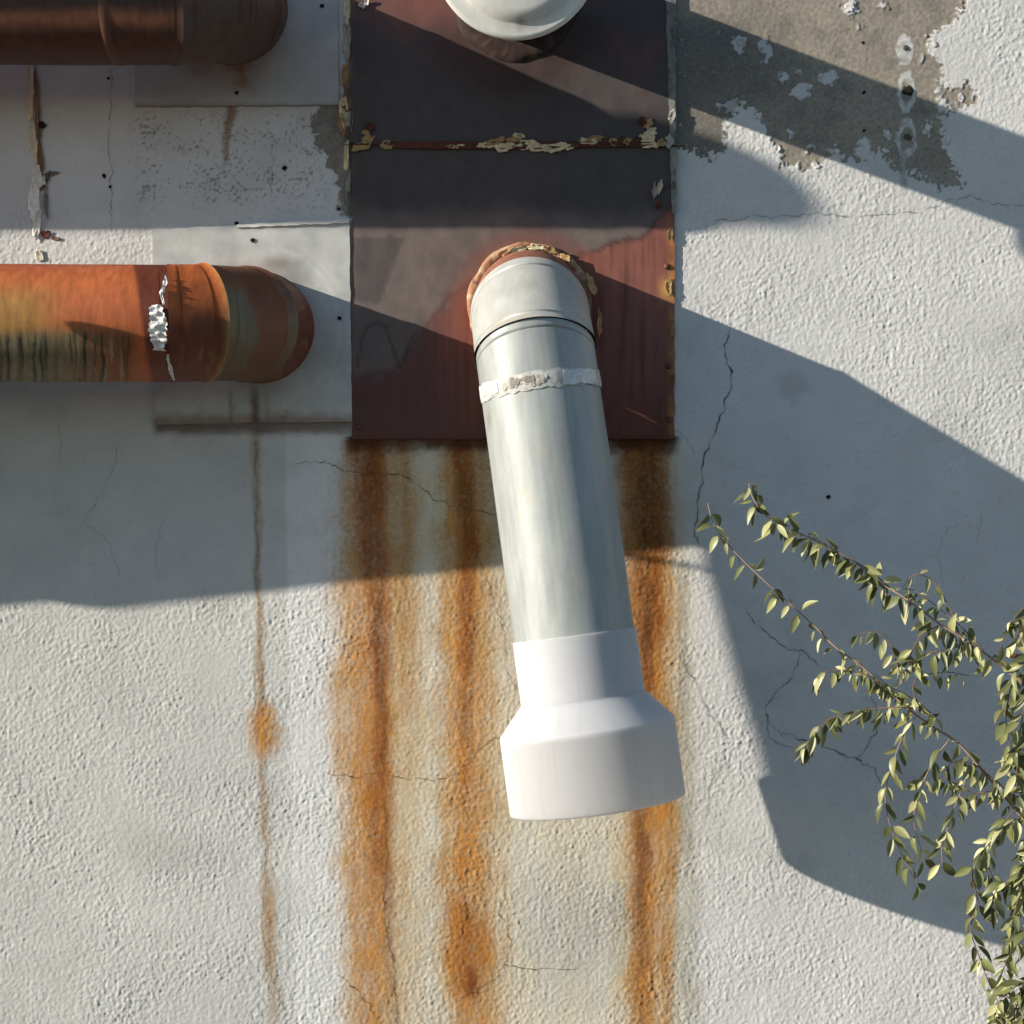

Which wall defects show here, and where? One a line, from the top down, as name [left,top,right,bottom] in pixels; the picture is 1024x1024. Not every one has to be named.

peeling [311,0,978,217]
crack [694,337,733,544]
corrosion [608,436,676,706]
corrosion [334,436,496,1024]
corrosion [628,802,676,1024]